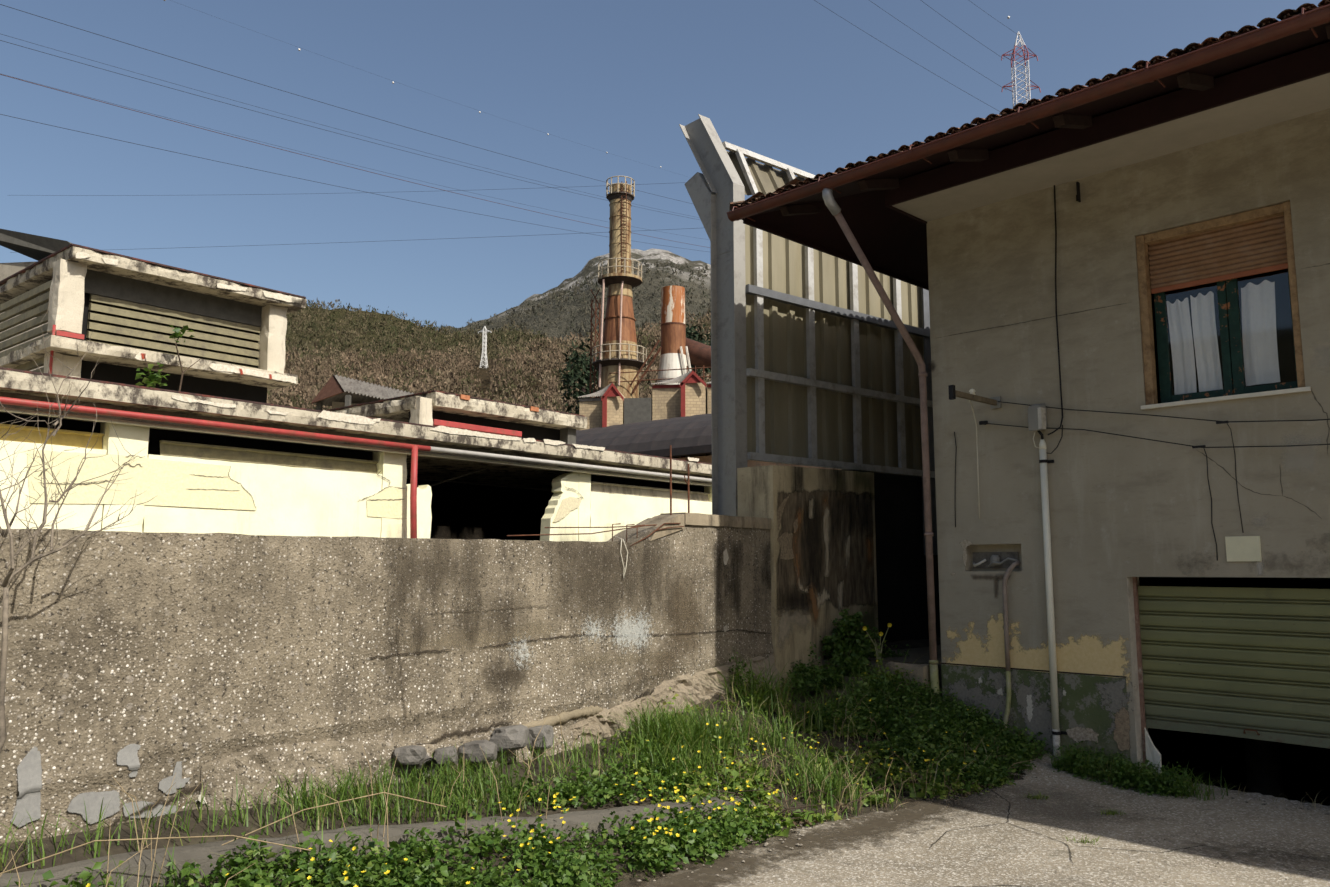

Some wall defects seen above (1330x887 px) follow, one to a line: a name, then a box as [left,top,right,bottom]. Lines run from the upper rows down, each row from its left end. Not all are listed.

leakage [715,545,741,632]
peeling [939,613,1132,756]